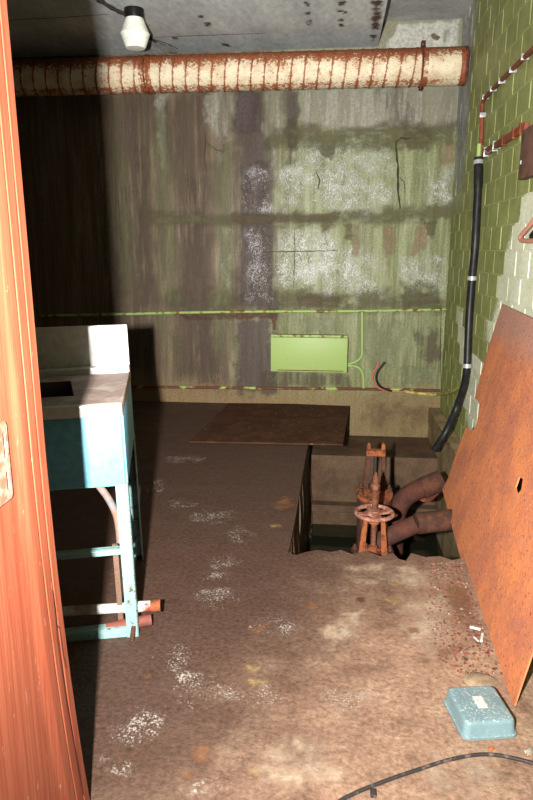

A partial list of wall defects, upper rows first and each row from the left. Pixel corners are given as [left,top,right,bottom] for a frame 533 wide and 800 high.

crack [395,137,413,209]
water stain [105,88,465,381]
water stain [237,319,287,394]